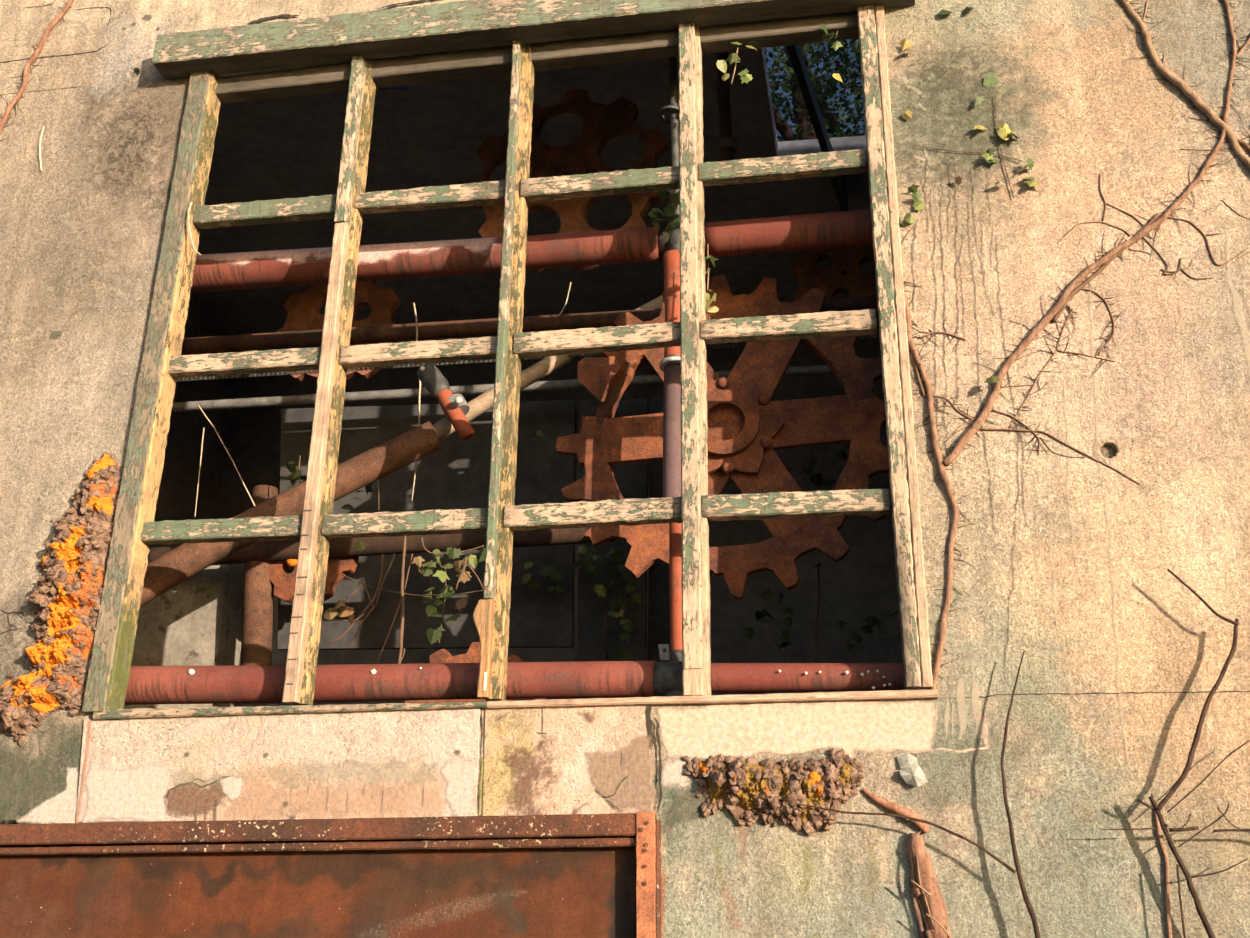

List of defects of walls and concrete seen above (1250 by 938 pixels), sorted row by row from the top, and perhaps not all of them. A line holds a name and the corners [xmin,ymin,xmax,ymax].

crack [912,691,1250,702]
peeling [587,701,990,812]
peeling [18,764,243,824]